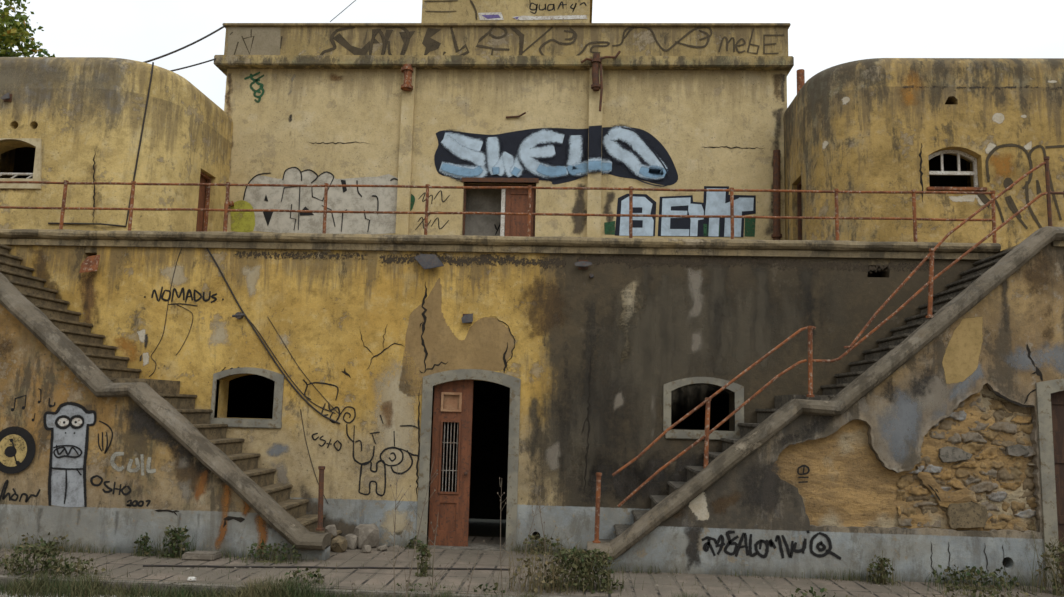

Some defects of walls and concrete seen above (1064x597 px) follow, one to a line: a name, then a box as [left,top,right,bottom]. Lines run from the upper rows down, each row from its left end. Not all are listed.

spalling [235,250,366,295]
spalling [379,253,929,273]
crack [342,282,448,497]
flaking render [375,278,516,478]
peeling [547,443,559,470]
spalling [775,365,1037,532]